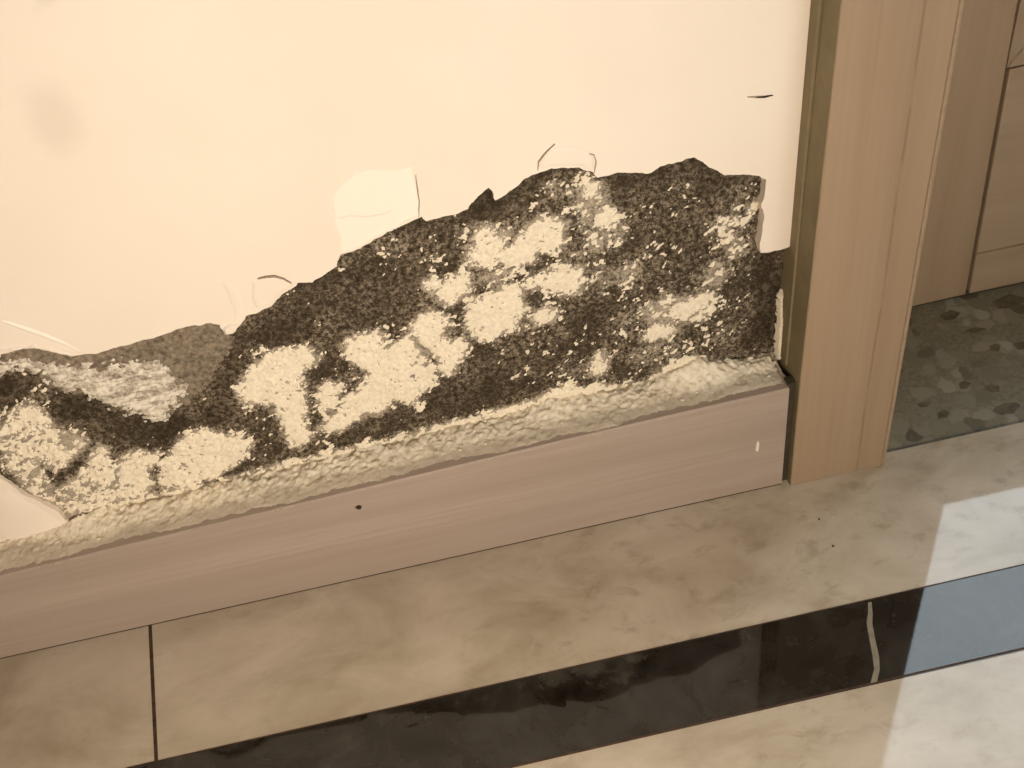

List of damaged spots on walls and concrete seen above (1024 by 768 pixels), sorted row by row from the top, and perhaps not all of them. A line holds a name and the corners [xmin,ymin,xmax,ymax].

flaking render [0,157,784,519]